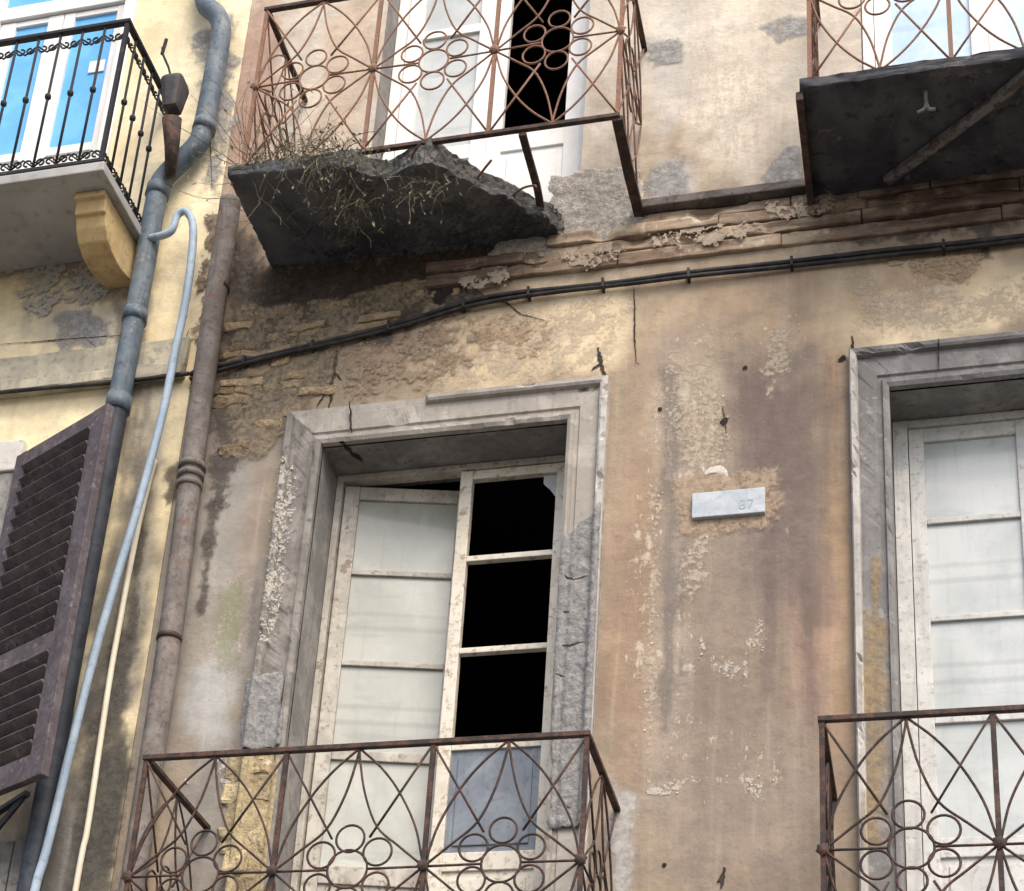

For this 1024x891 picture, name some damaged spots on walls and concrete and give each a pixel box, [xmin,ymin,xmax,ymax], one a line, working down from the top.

spalling [547,165,647,240]
spalling [5,263,111,351]
leakage [222,229,494,349]
flaking render [212,279,631,462]
crack [578,347,606,390]
crack [632,287,640,364]
leakage [196,395,252,615]
peeling [259,456,298,643]
leakage [674,469,784,534]
spalling [548,502,604,829]
flaking render [217,755,280,891]
leakage [607,792,636,891]